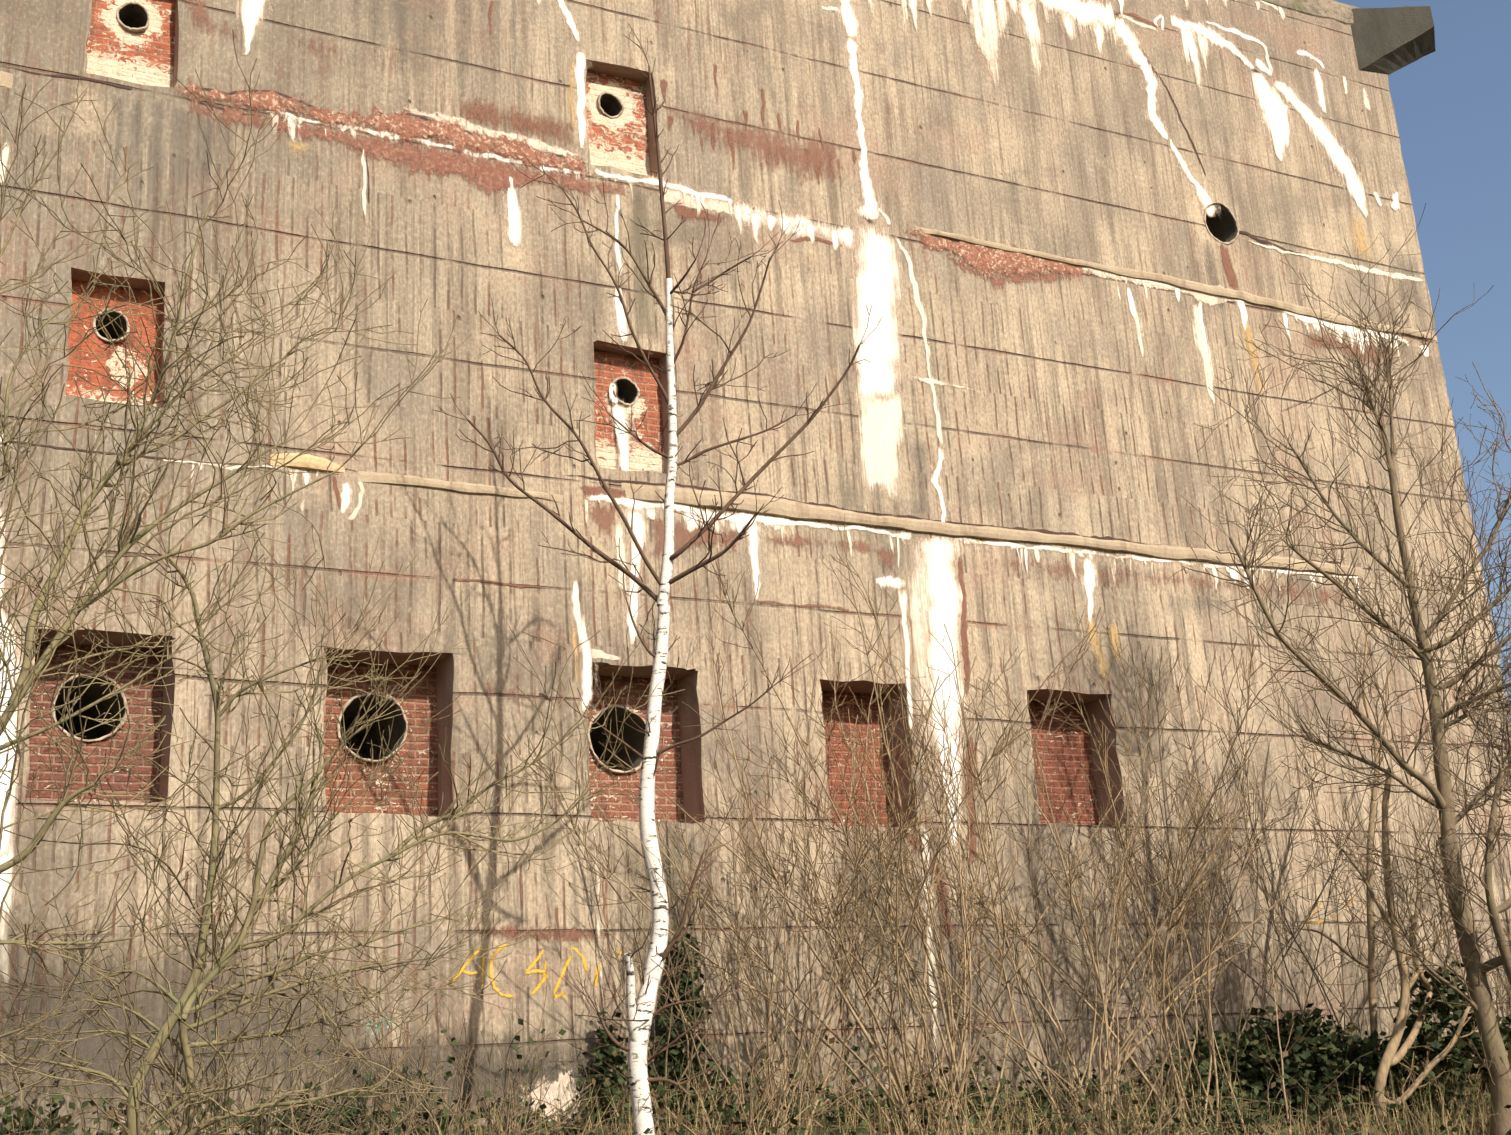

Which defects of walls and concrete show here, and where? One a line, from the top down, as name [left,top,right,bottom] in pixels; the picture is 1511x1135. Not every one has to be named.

efflorescence [236,0,270,55]
efflorescence [1255,0,1285,20]
efflorescence [1296,50,1371,113]
spalling [174,78,597,183]
spalling [906,229,1091,289]
damp [265,111,1360,1071]
damp [0,501,591,1129]